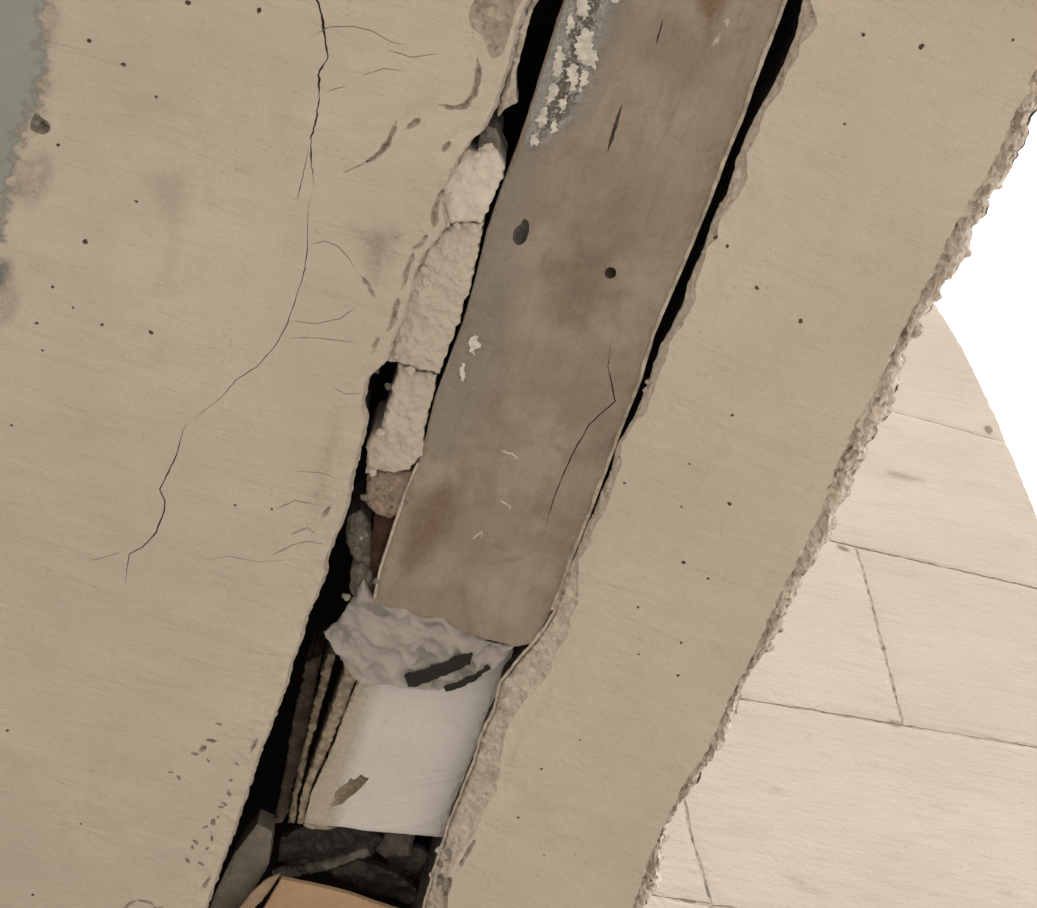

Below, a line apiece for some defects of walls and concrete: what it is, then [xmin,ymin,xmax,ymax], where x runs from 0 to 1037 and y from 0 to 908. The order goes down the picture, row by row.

crack [125,0,355,582]
spalling [185,0,531,908]
crack [544,345,616,533]
spalling [422,0,818,908]